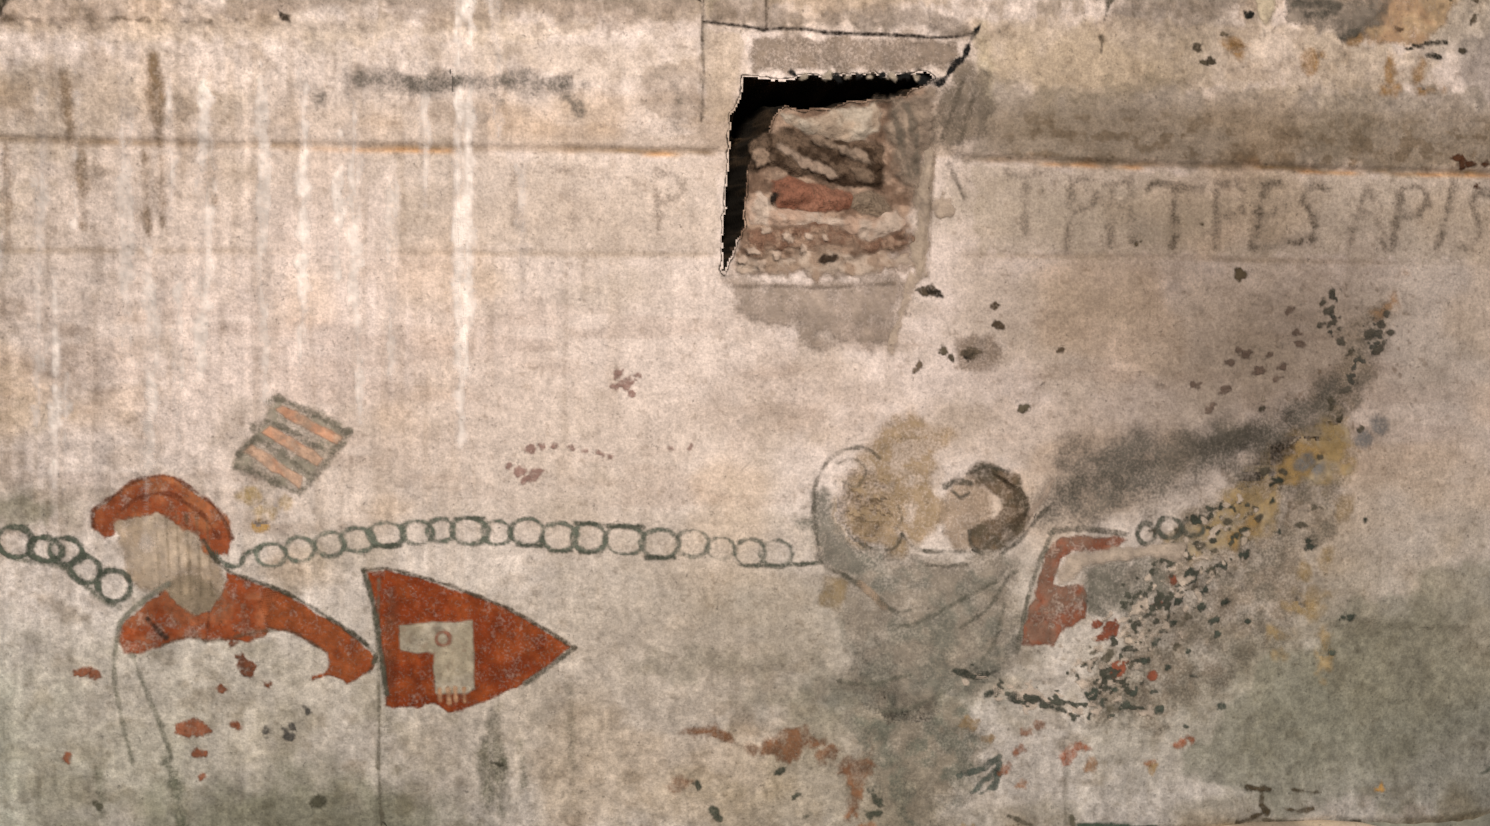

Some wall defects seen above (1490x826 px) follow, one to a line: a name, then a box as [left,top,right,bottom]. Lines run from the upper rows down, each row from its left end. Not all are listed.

leakage [32,174,72,489]
leakage [61,77,85,188]
leakage [143,355,159,469]
leakage [148,53,171,140]
leakage [117,81,217,386]
leakage [254,80,271,269]
leakage [294,69,312,358]
leakage [331,115,365,328]
leakage [404,0,476,447]
spalling [719,26,990,297]
leakage [1028,385,1334,524]